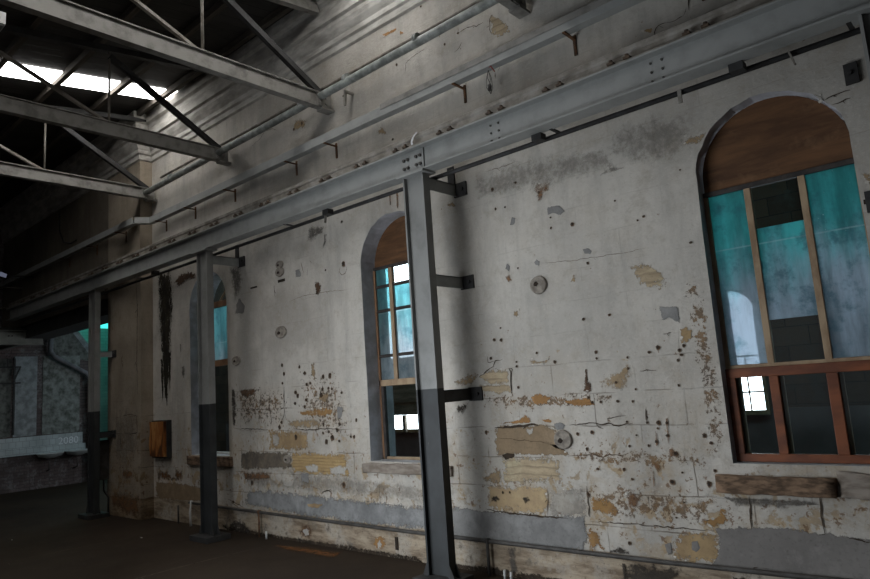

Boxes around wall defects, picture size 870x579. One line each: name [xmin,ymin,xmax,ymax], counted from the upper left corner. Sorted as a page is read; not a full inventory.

damp [157,268,181,402]
spalling [236,362,355,480]
spalling [456,368,706,515]
peeling [631,263,666,290]
peeling [680,283,722,453]
spalling [587,481,730,564]